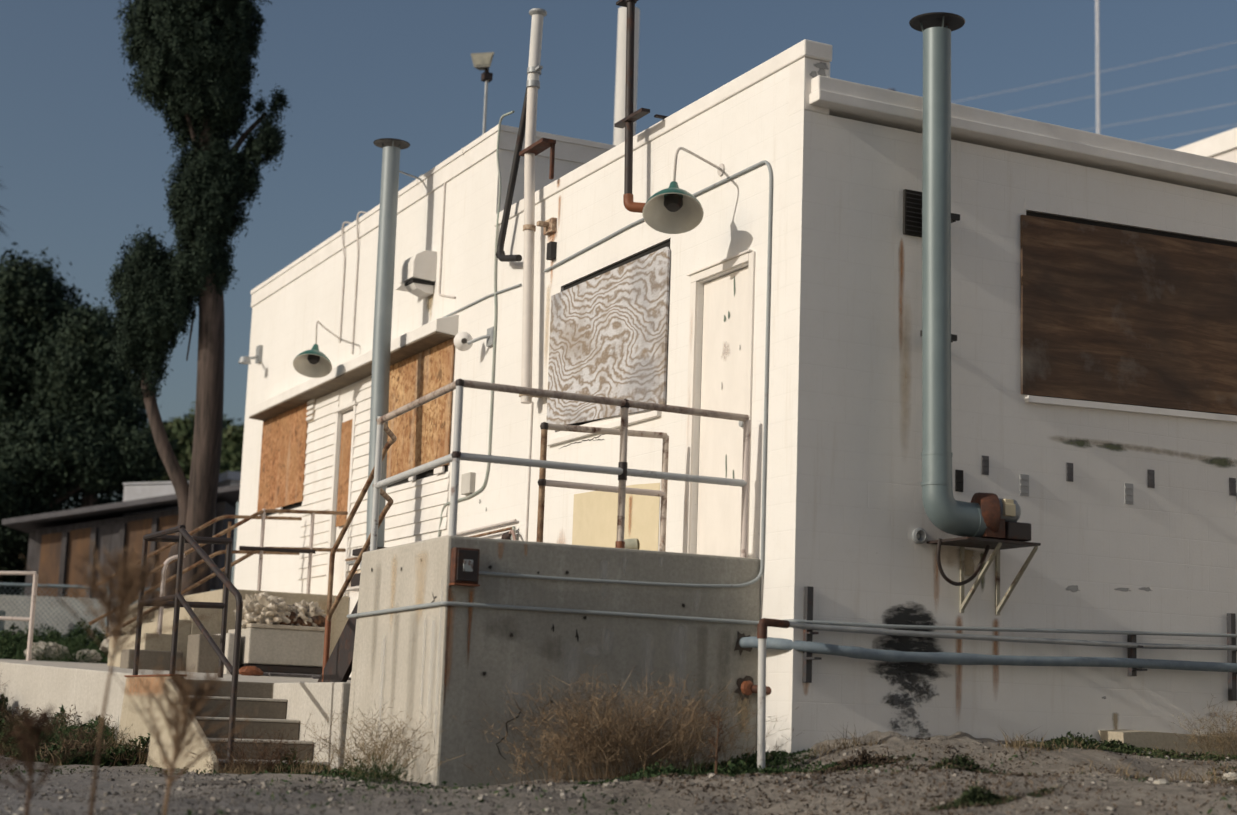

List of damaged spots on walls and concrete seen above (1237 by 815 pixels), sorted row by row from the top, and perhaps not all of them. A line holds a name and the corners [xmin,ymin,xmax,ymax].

corrosion [444,586,453,697]